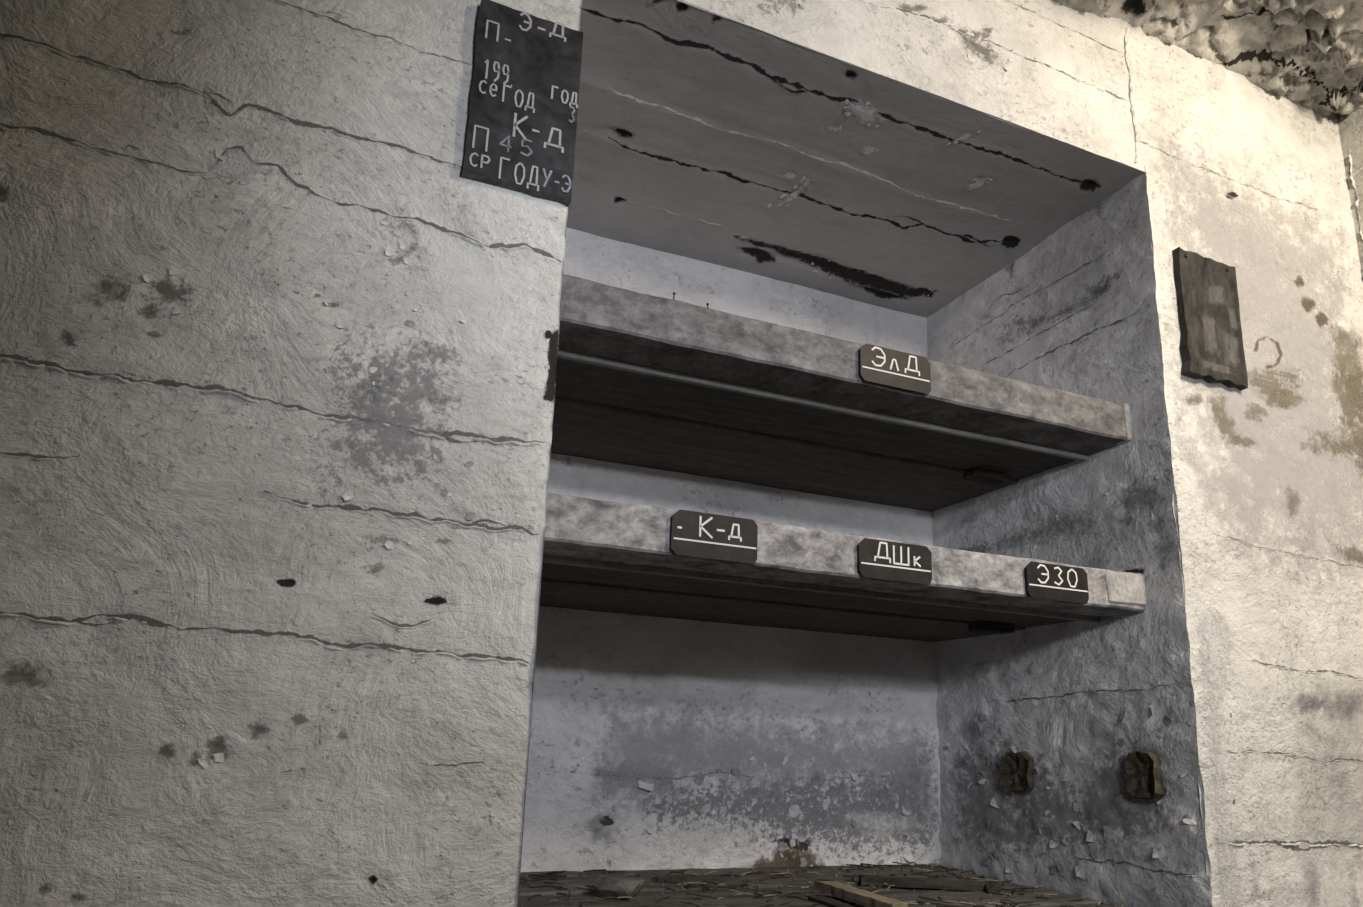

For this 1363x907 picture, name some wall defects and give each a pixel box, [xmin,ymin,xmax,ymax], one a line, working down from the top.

crack [0,33,562,264]
crack [603,87,1010,247]
crack [582,8,1082,183]
crack [858,0,1318,211]
spalling [1122,0,1148,16]
crack [1221,0,1363,111]
crack [1346,151,1363,272]
crack [0,354,543,447]
rust [1254,337,1283,368]
rust [1296,276,1328,326]
crack [0,611,529,666]
crack [1215,838,1363,851]